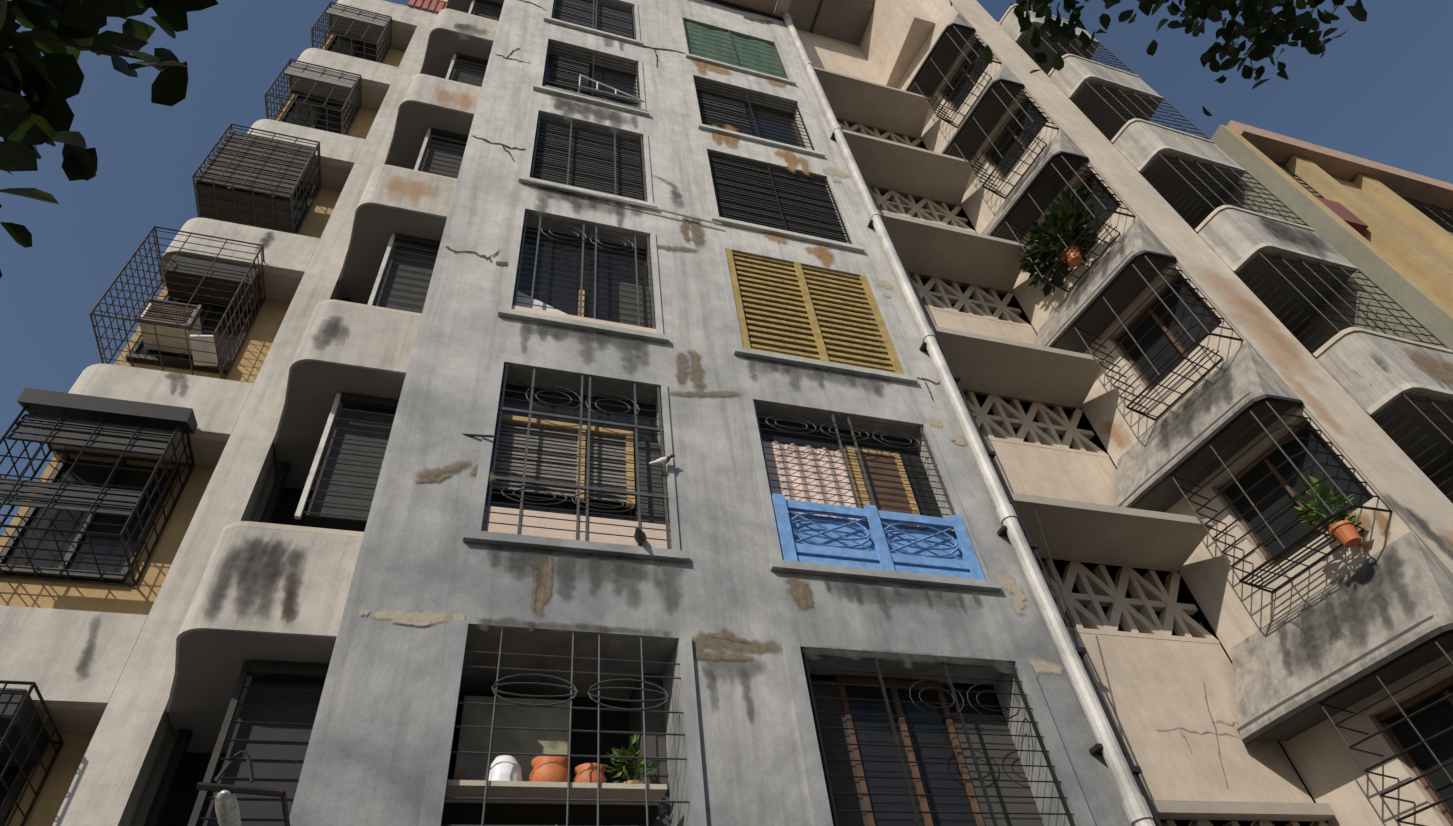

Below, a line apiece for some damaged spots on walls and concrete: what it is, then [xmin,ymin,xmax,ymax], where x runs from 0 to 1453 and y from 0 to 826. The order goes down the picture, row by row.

crack [472,135,526,160]
crack [445,246,519,267]
peeling [676,353,689,383]
damp [206,542,303,620]
peeling [359,608,465,626]
damp [1278,552,1410,669]
crack [1158,684,1239,786]